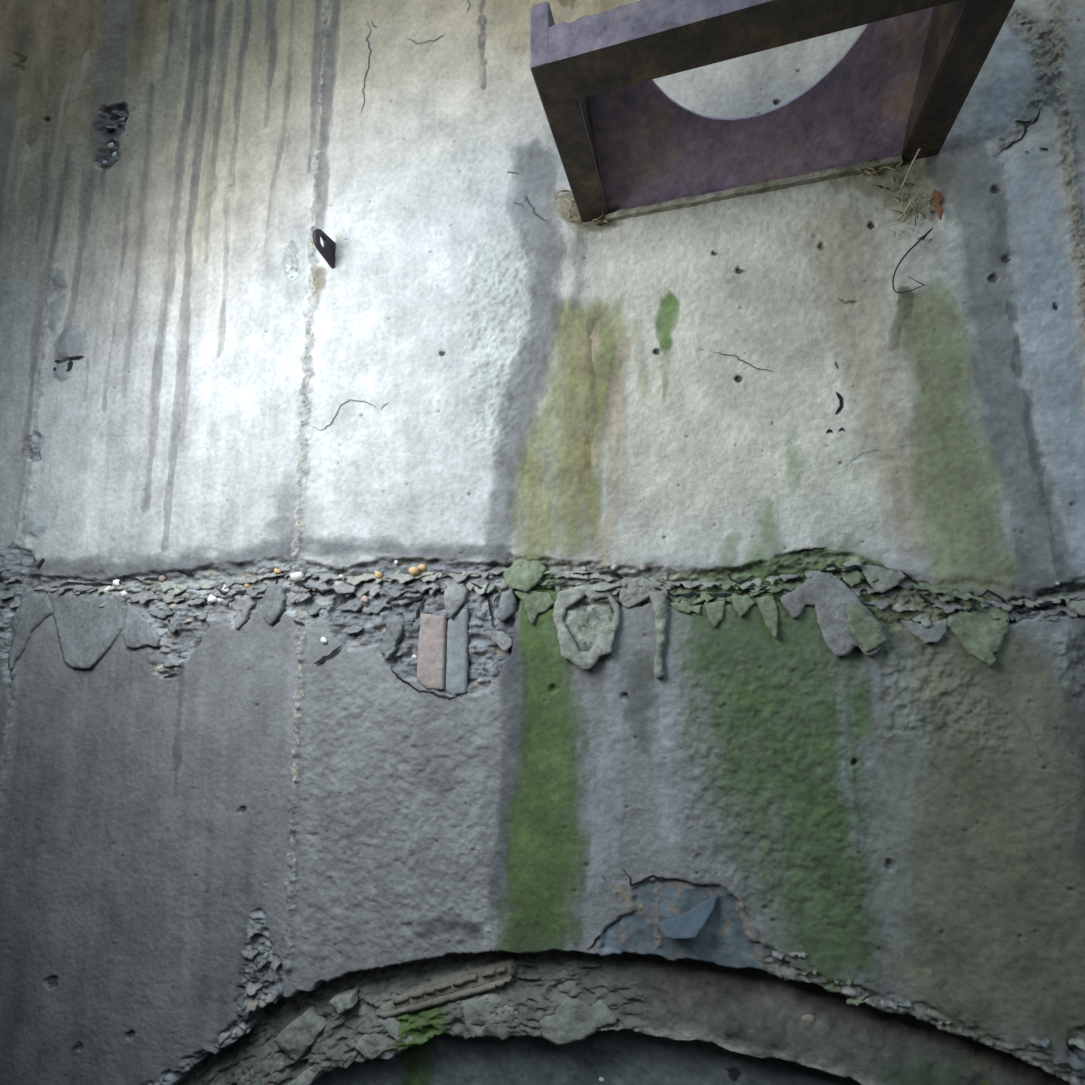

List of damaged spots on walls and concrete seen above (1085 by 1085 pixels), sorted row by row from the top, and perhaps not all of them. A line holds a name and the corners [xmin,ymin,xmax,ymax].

spalling [93,101,129,171]
damp [163,50,218,258]
damp [312,0,339,227]
crack [361,20,377,112]
crack [994,108,1041,157]
damp [152,283,168,392]
damp [171,277,189,461]
crack [311,399,389,431]
crack [716,352,774,372]
spalling [0,542,1085,698]
spalling [150,908,284,1085]
spalling [599,880,1085,1085]